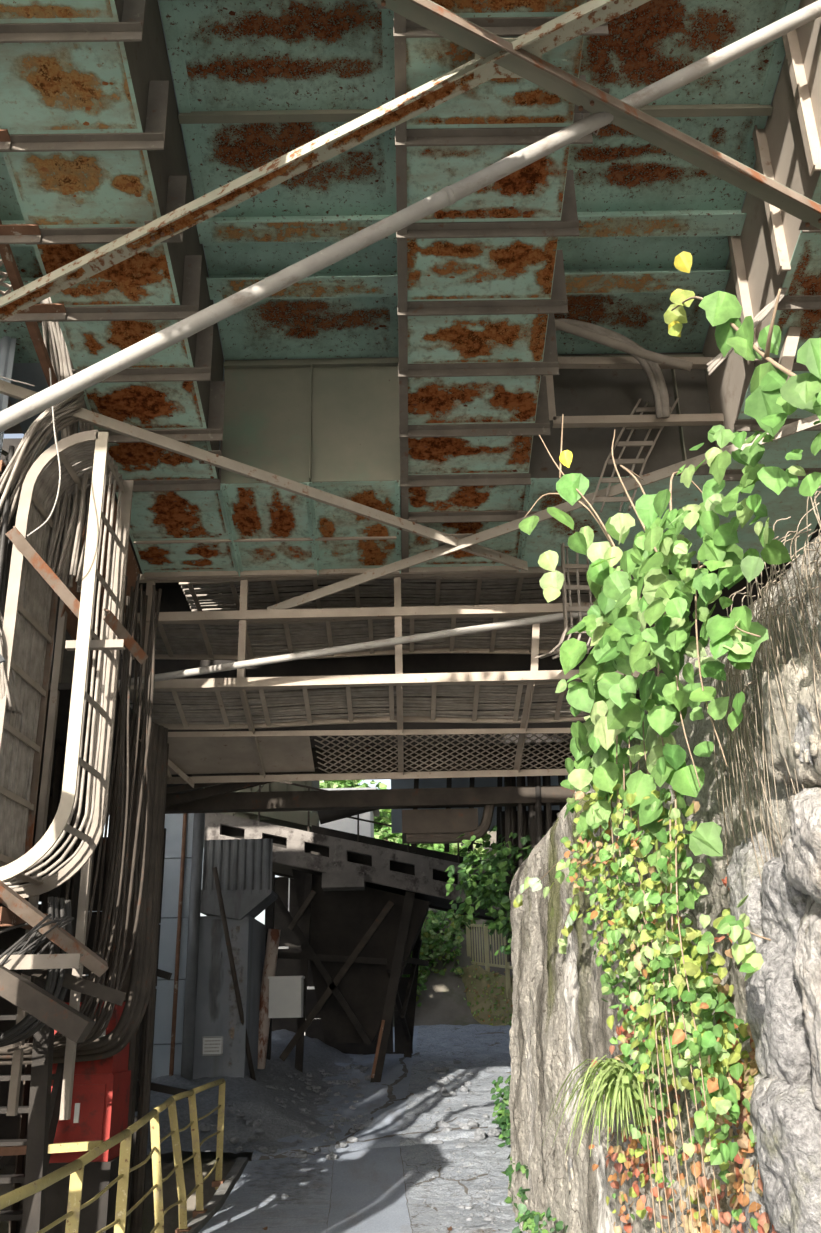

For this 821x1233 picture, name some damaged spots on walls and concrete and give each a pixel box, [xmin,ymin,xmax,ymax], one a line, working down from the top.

rust [186,0,383,90]
rust [559,0,743,88]
rust [0,41,574,318]
rust [423,124,710,219]
rust [579,218,685,237]
rust [70,320,166,369]
rust [247,281,390,347]
rust [778,242,821,339]
rust [317,237,674,566]
rust [85,340,311,571]
crack [231,1052,488,1233]